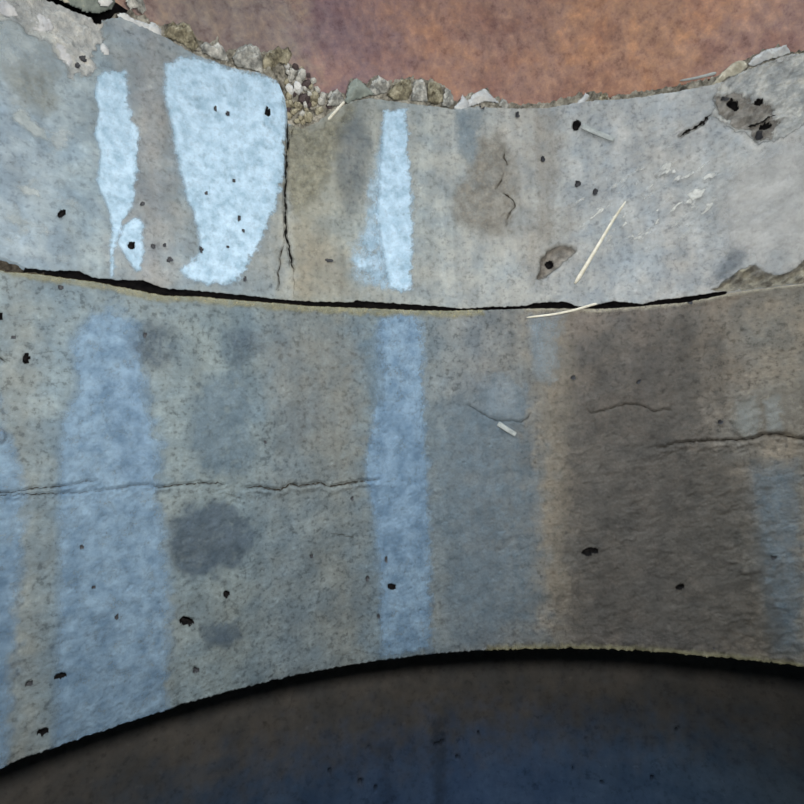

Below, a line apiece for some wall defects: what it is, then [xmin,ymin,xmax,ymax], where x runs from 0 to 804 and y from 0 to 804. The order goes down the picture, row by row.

spalling [0,0,104,78]
spalling [112,9,804,144]
efflorescence [94,70,144,276]
efflorescence [164,56,288,285]
crack [23,124,727,311]
efflorescence [353,109,414,293]
spalling [712,261,804,292]
damp [56,313,169,746]
crack [0,479,376,498]
damp [172,504,252,573]
efflorescence [367,314,431,655]
crack [661,433,803,447]